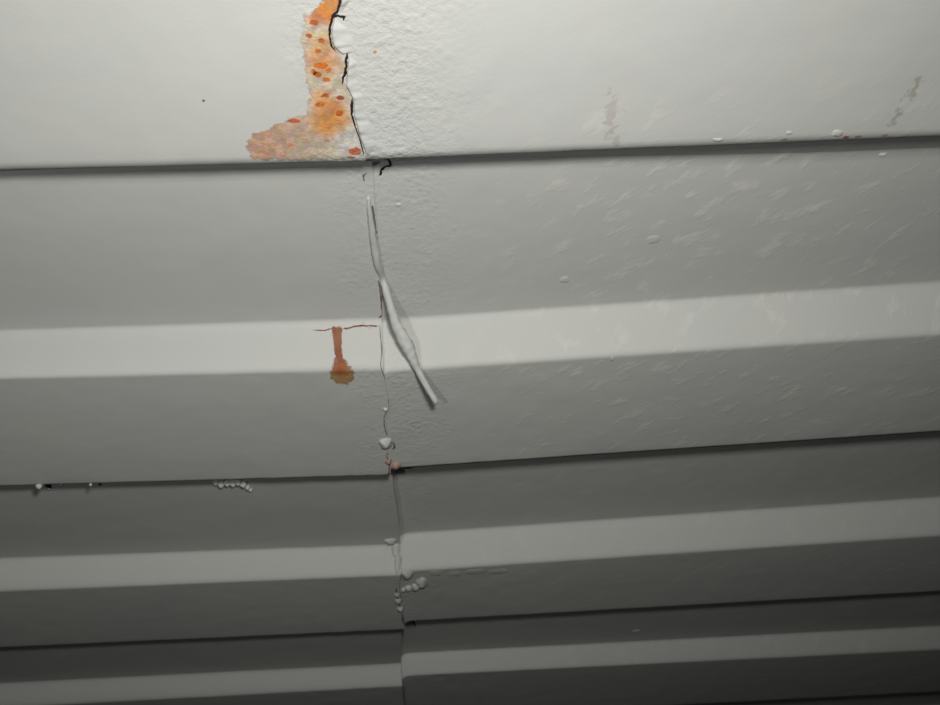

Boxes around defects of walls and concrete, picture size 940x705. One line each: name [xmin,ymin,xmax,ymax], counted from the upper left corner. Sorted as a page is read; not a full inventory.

rust [246,0,365,161]
crack [328,0,395,180]
rust [316,325,377,384]
crack [377,280,385,379]
crack [384,412,396,476]